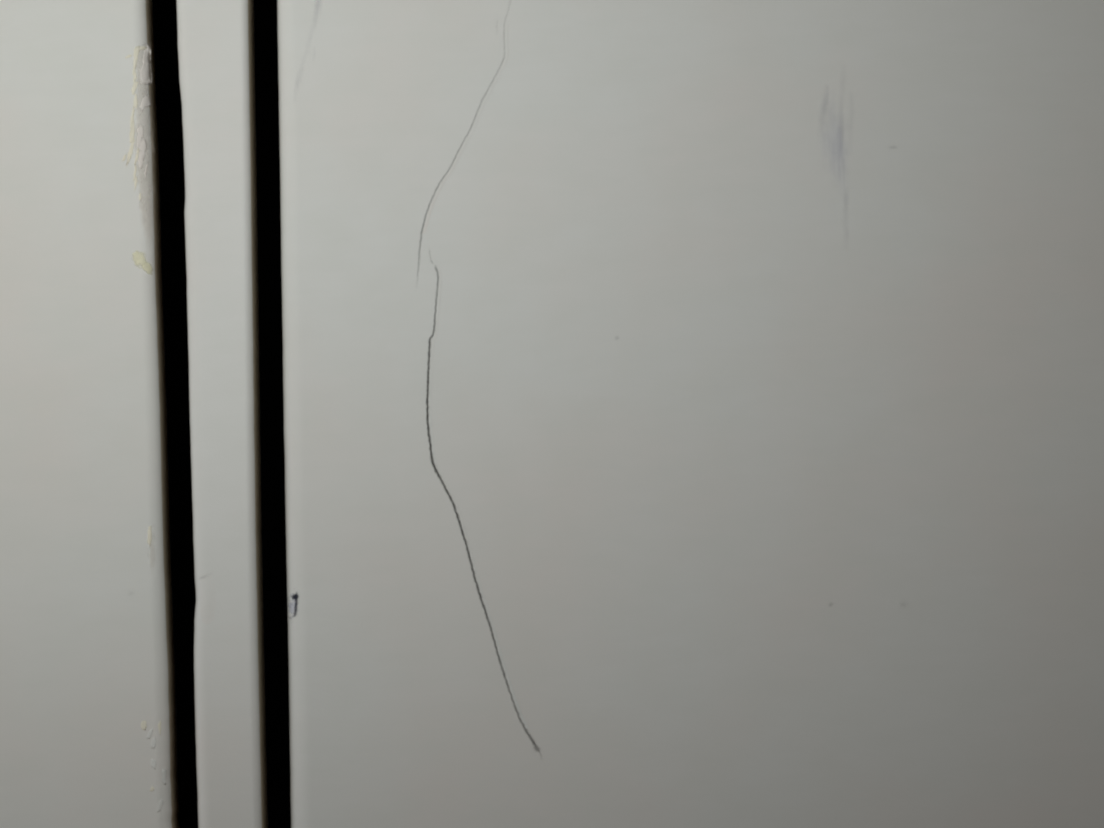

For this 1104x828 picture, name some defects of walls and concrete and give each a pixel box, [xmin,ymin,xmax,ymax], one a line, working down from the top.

peeling [122,45,152,201]
crack [426,271,535,744]